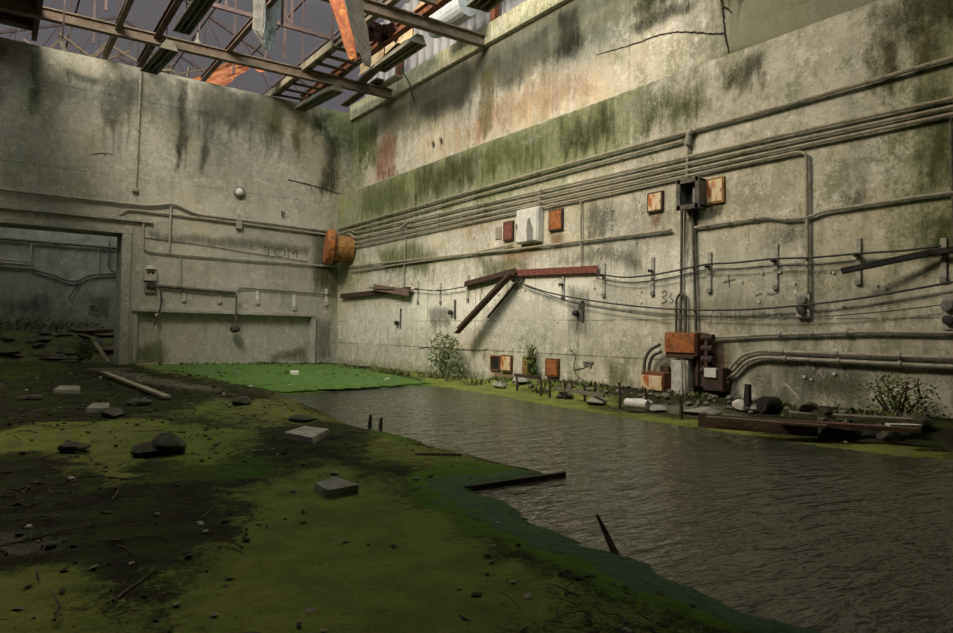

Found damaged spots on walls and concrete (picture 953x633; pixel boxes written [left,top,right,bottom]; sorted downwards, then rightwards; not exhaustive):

water stain [635,0,690,31]
crack [597,0,733,55]
water stain [178,82,187,157]